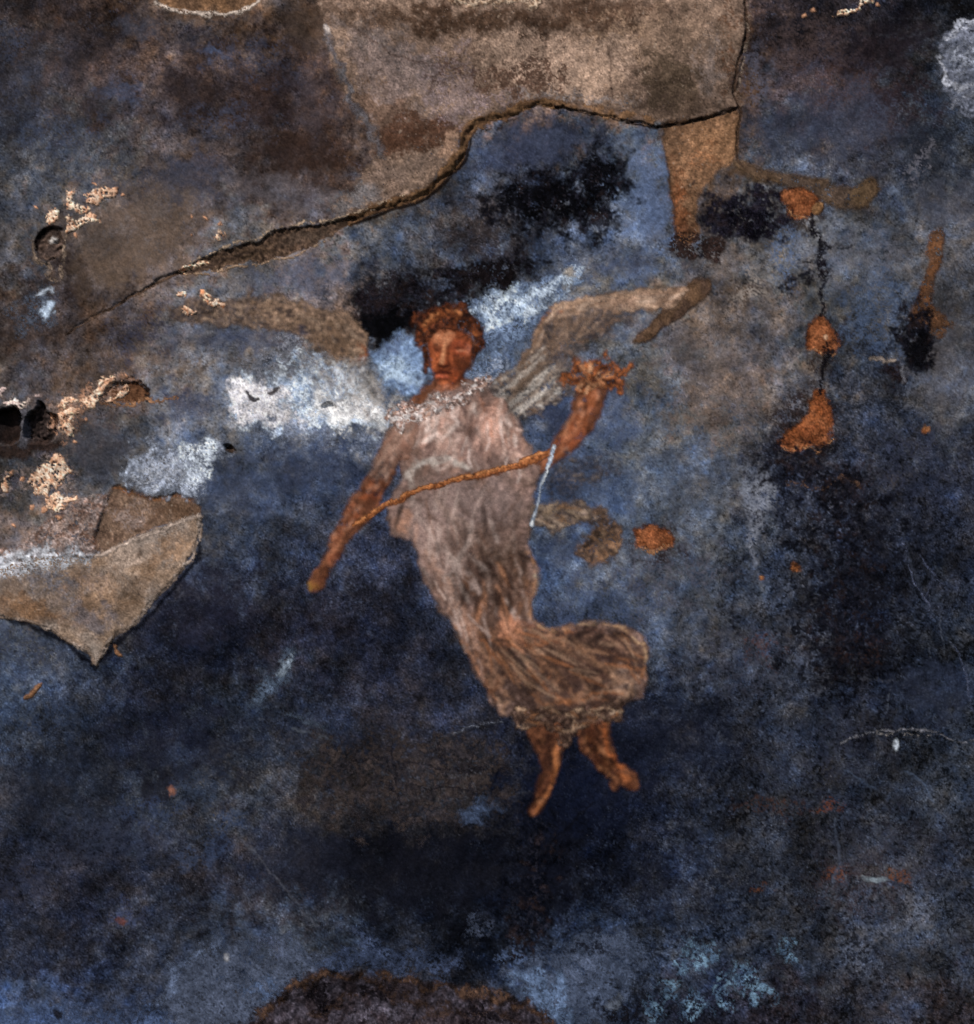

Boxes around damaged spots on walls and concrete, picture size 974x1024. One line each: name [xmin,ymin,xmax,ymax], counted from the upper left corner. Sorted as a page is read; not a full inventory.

crack [555,0,750,167]
water stain [936,18,974,117]
peeling [34,183,124,243]
crack [66,119,516,334]
water stain [348,141,635,384]
flaking render [0,371,202,670]